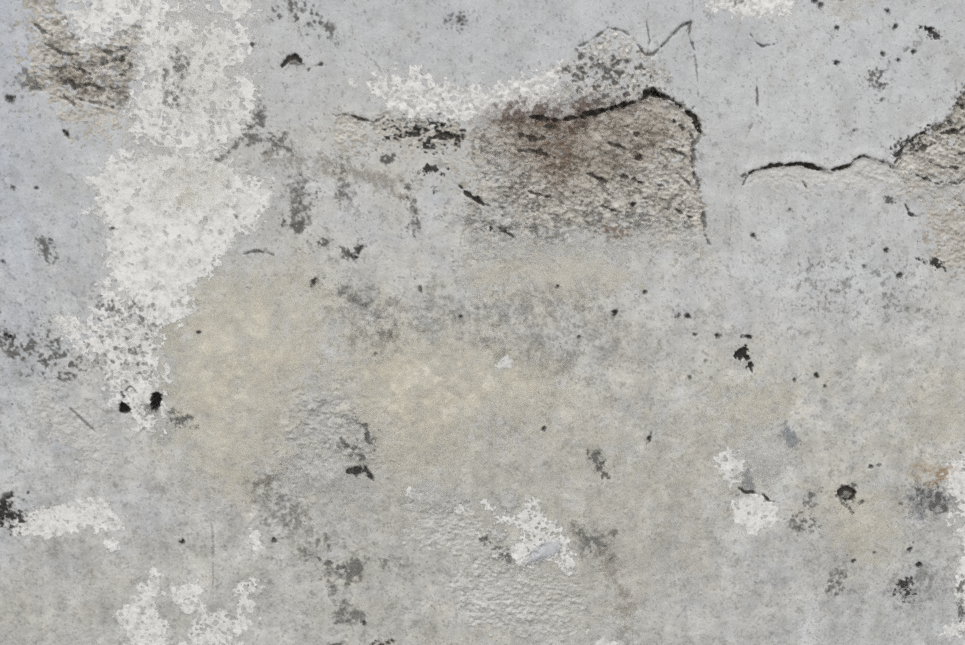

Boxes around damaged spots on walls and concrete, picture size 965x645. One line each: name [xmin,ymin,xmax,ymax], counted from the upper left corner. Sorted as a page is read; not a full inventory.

peeling [702,0,797,27]
peeling [0,0,277,474]
flaking render [317,26,719,279]
crack [743,155,919,217]
flaking render [889,86,965,288]